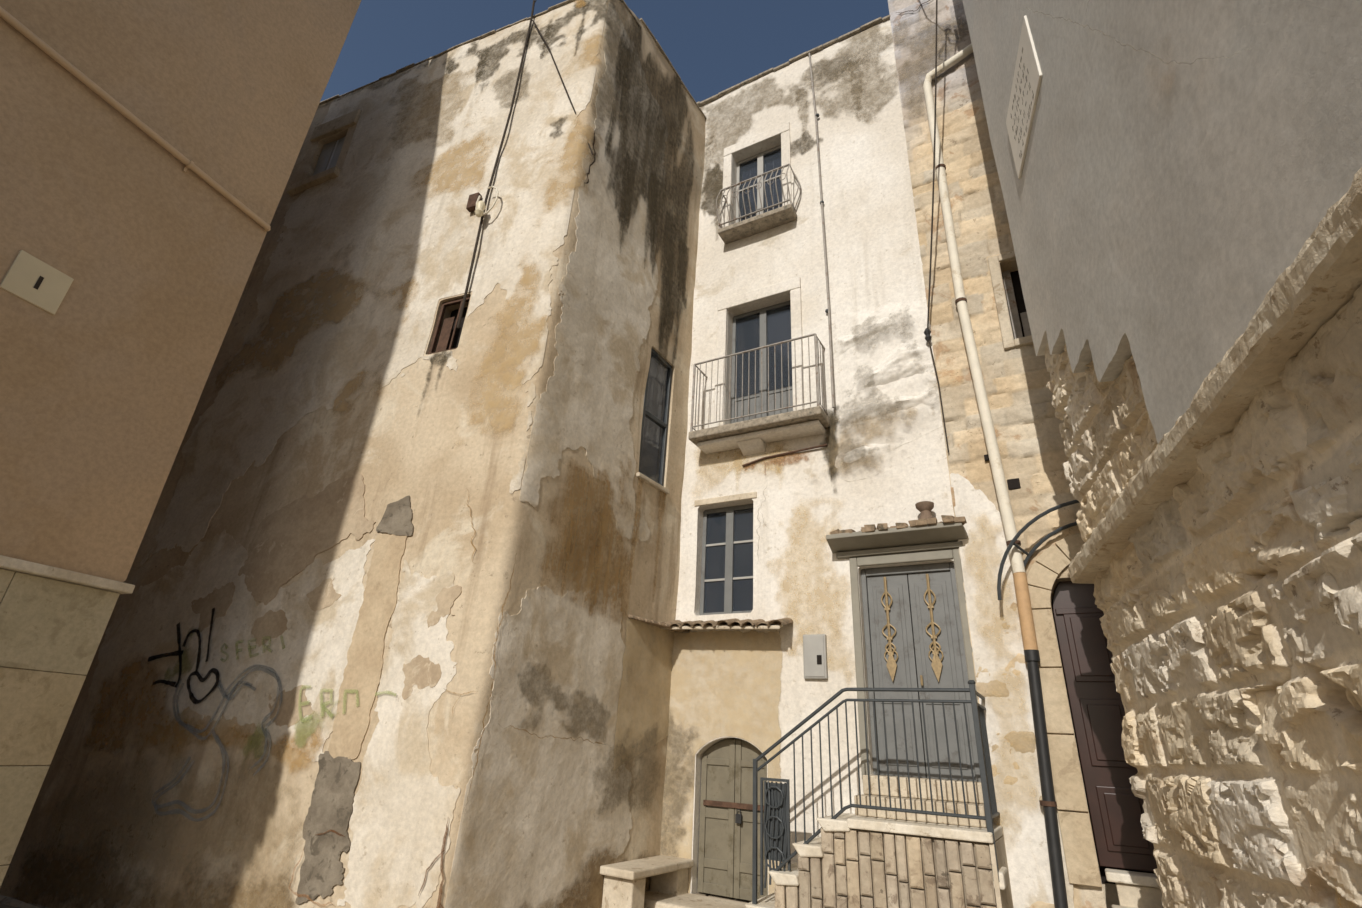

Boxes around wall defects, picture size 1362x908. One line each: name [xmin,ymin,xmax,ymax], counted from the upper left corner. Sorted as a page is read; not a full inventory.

damp [547,1,964,367]
flaking render [80,0,667,762]
damp [820,406,891,478]
crack [467,497,476,564]
damp [541,463,643,618]
damp [14,661,293,908]
crack [418,564,606,908]
damp [518,668,606,738]
damp [599,718,693,853]
damp [546,849,642,908]